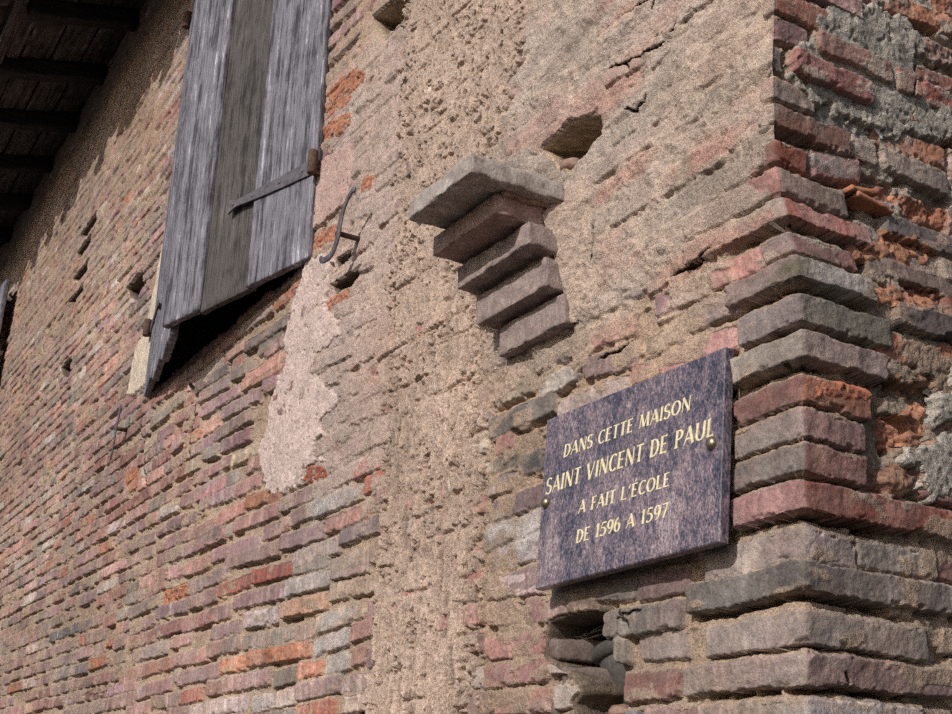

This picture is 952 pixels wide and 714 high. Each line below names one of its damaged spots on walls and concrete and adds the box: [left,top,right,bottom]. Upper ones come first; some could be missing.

crack [621,0,655,16]
crack [608,23,676,70]
crack [624,96,646,113]
crack [670,240,716,277]
spalling [303,465,328,485]